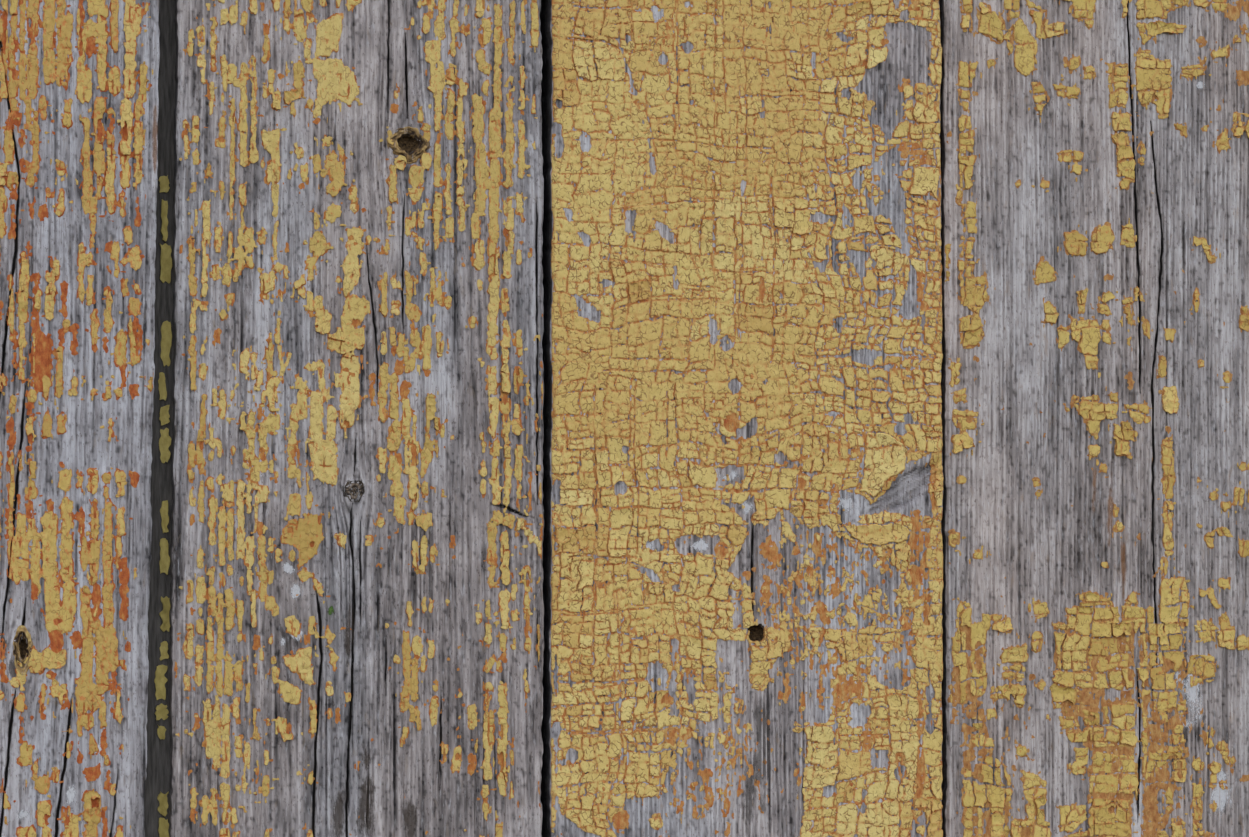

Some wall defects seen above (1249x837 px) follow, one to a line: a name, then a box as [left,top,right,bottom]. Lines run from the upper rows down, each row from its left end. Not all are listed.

peeling [0,0,172,837]
peeling [154,0,544,837]
crack [748,525,756,616]
peeling [550,0,1249,837]